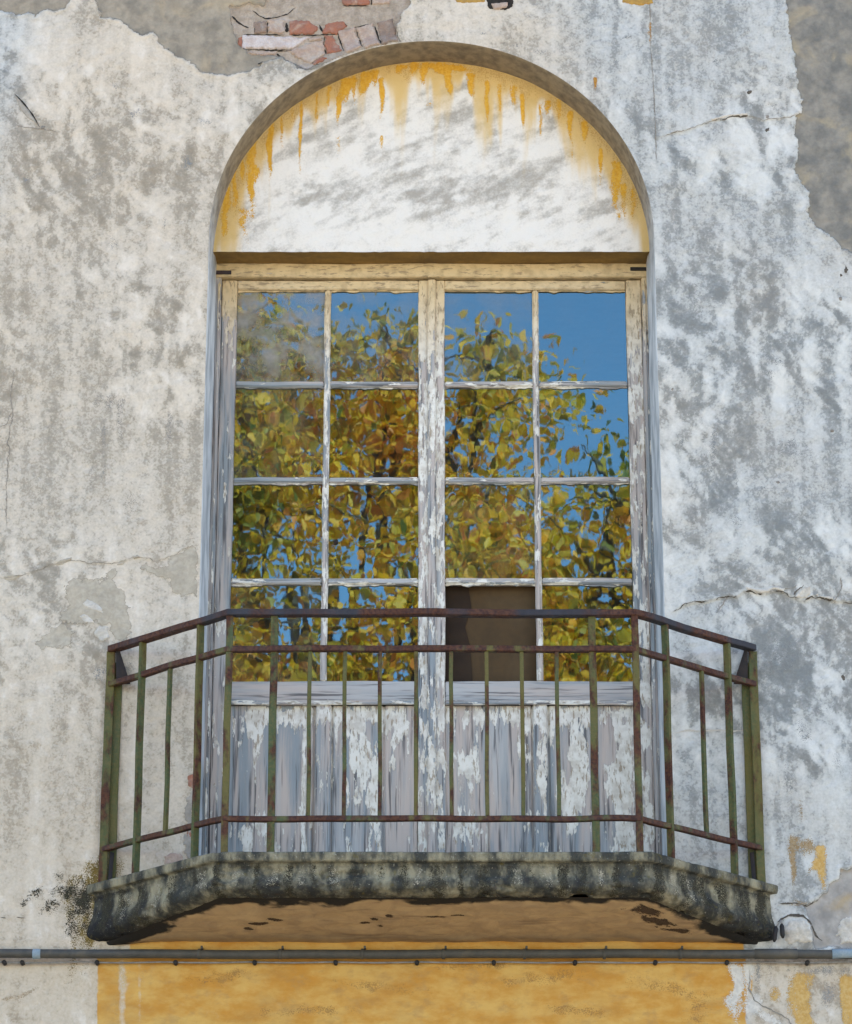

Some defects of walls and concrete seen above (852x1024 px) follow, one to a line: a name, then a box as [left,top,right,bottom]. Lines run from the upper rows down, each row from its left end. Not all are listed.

flaking render [95,0,411,76]
leakage [220,62,641,243]
crack [650,47,794,160]
flaking render [786,0,852,253]
flaking render [35,568,131,650]
flaking render [140,545,198,597]
crack [675,578,852,612]
leakage [20,855,153,978]
leakage [427,863,535,898]
leakage [636,865,771,937]
crack [777,902,822,941]
flaking render [722,963,782,1024]